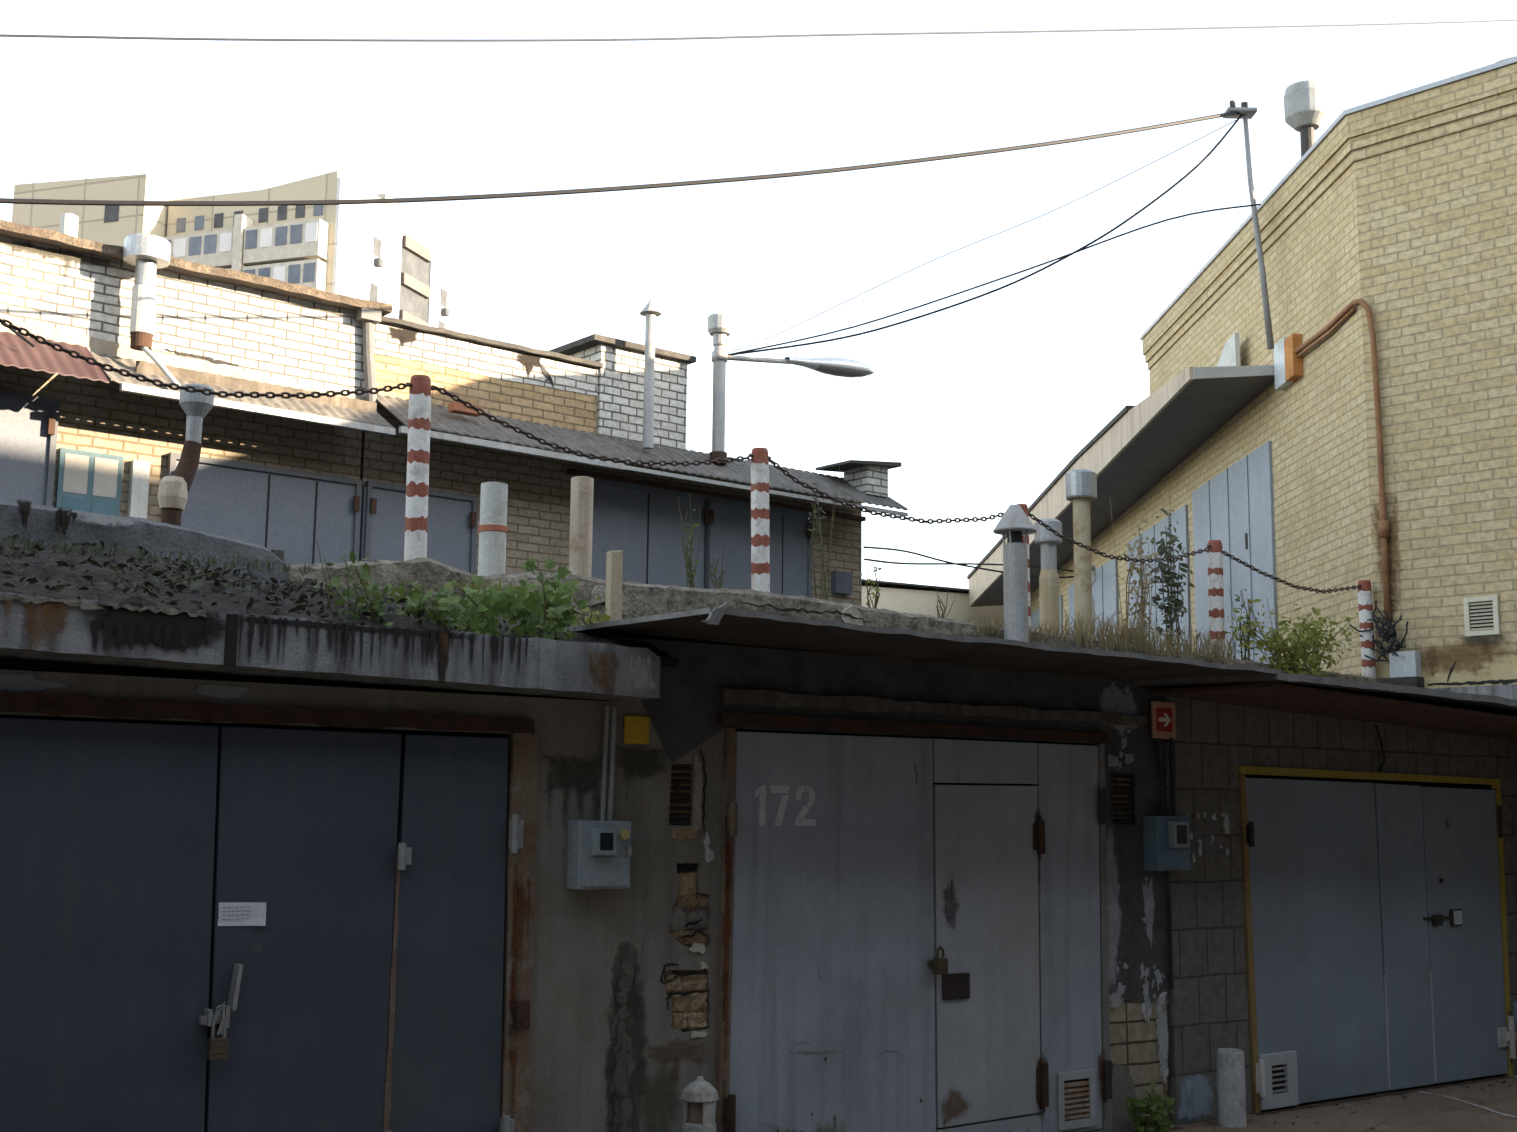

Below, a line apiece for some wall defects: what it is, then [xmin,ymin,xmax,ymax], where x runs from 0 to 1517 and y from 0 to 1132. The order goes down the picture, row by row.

water stain [90,604,528,683]
water stain [1462,635,1502,644]
peeling [1100,682,1139,771]
spalling [672,749,707,840]
rust [509,867,531,1119]
spalling [661,863,709,1038]
peeling [1106,829,1165,1022]
water stain [605,965,646,1132]
rust [943,1092,967,1123]